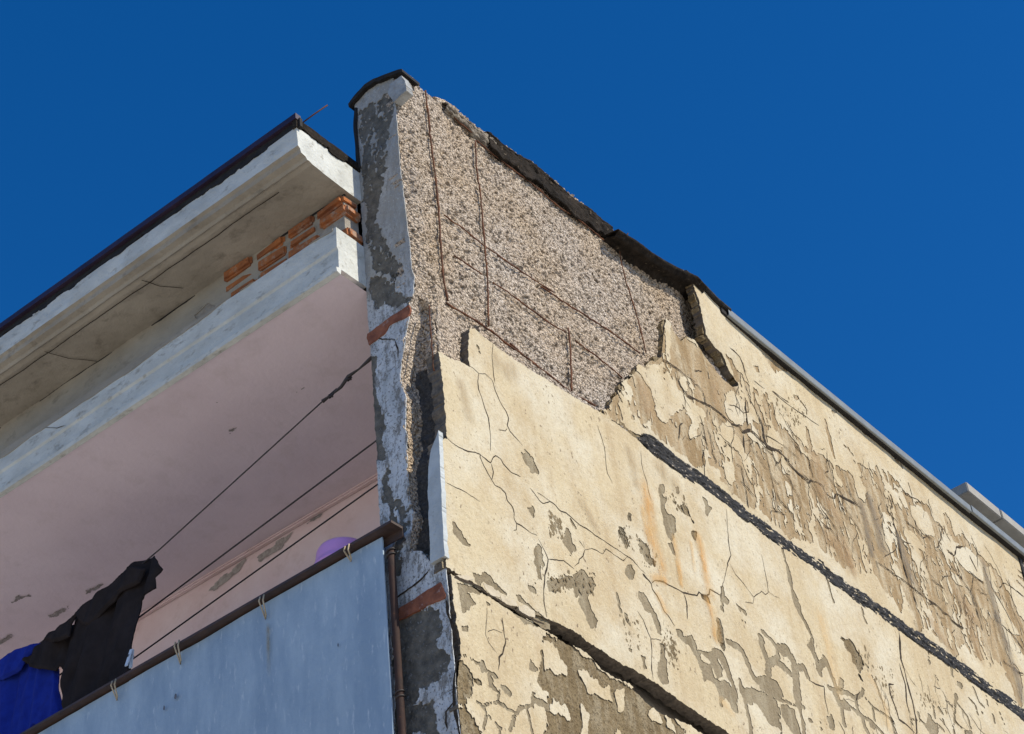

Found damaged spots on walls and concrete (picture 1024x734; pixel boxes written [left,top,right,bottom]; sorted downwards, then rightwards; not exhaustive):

peeling [0,301,225,459]
crack [0,192,279,385]
spalling [359,83,1024,734]
crack [445,348,1024,734]